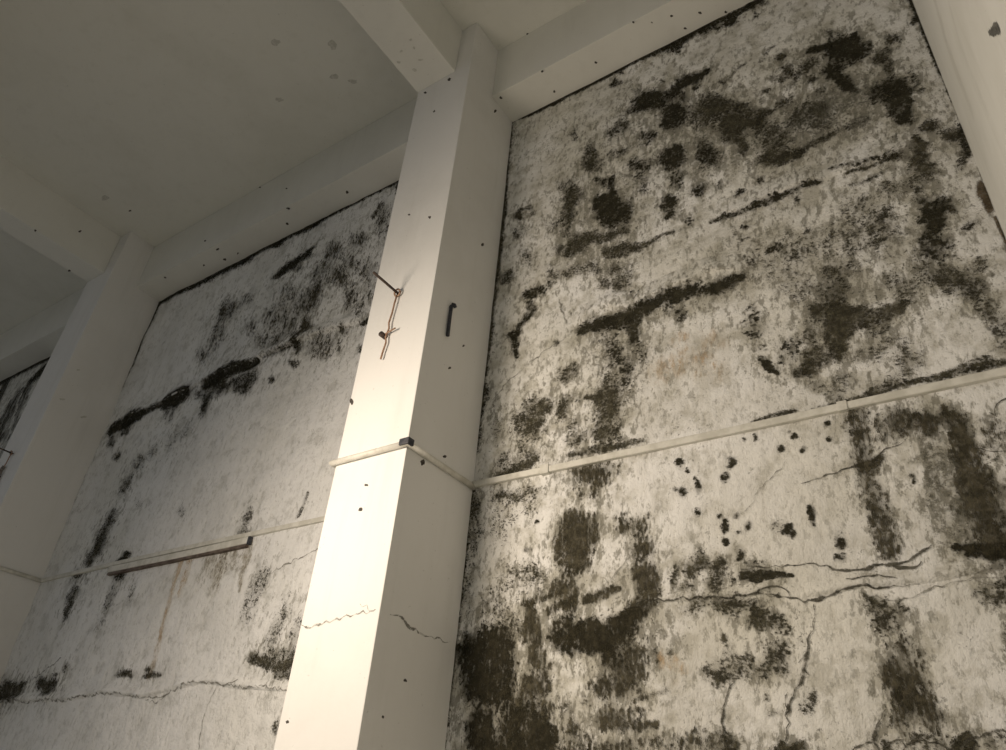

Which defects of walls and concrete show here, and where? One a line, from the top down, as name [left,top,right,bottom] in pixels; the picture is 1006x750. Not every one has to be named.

damp [106,180,399,495]
damp [0,356,51,458]
damp [62,508,118,622]
damp [116,666,161,679]
crack [0,657,287,747]
damp [240,566,270,624]
damp [248,595,302,681]
crack [302,604,447,643]
crack [629,545,1006,750]